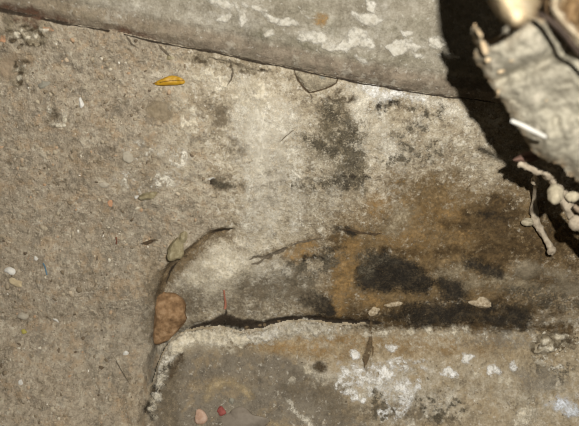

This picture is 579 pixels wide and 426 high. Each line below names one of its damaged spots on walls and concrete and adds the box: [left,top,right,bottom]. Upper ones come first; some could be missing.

crack [155,227,232,298]
damp [143,68,470,426]
crack [249,229,381,265]
damp [355,249,532,346]
crack [189,309,382,368]
damp [487,364,512,386]
damp [509,360,570,391]
damp [514,405,536,426]
damp [555,398,579,417]